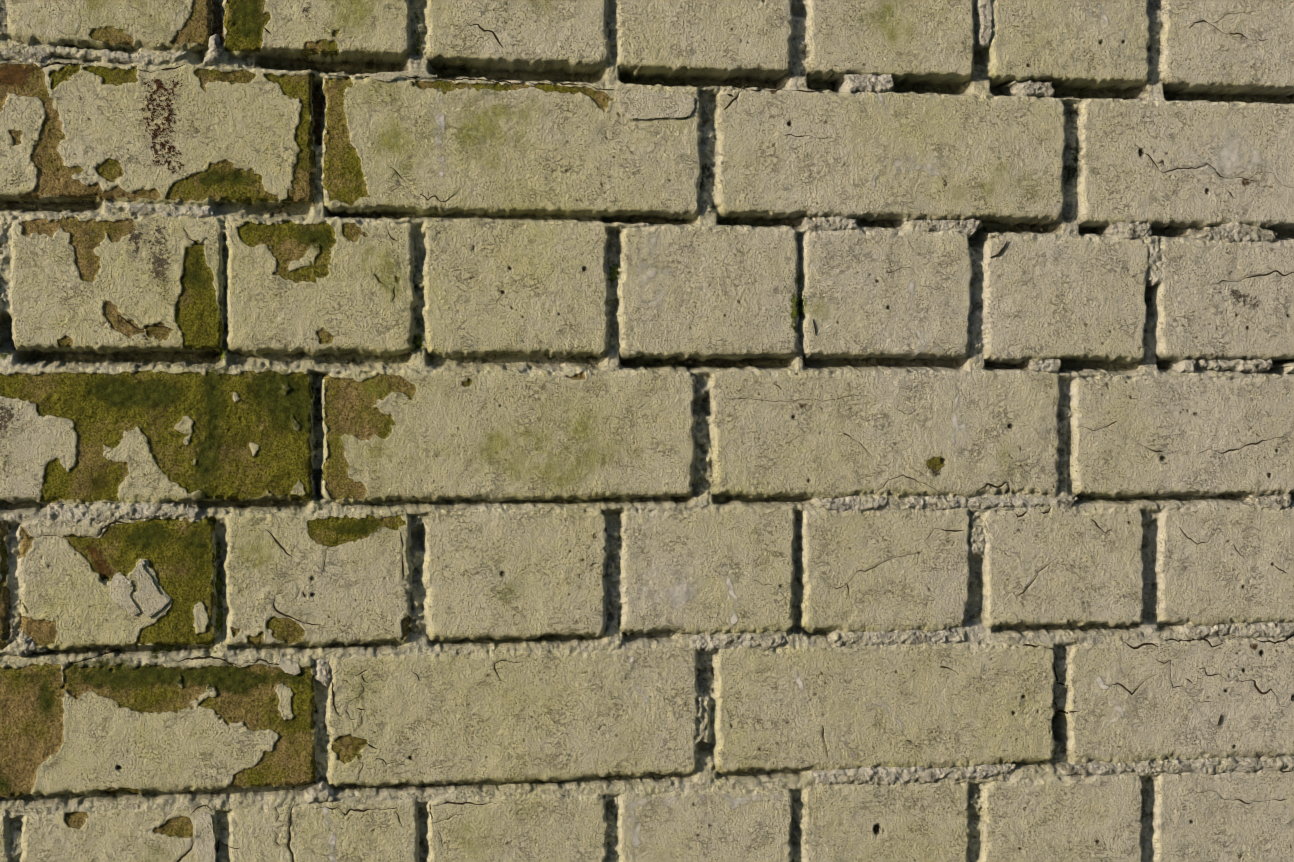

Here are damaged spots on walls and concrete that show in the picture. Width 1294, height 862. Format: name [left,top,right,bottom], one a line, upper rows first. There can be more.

peeling [0,27,695,283]
crack [1136,145,1294,199]
peeling [103,240,224,352]
crack [1215,270,1294,284]
peeling [0,370,416,504]
crack [1198,436,1287,460]
peeling [307,515,406,547]
crack [1179,527,1261,555]
peeling [64,515,216,646]
crack [1104,634,1294,707]
peeling [0,659,317,797]
peeling [332,734,367,764]